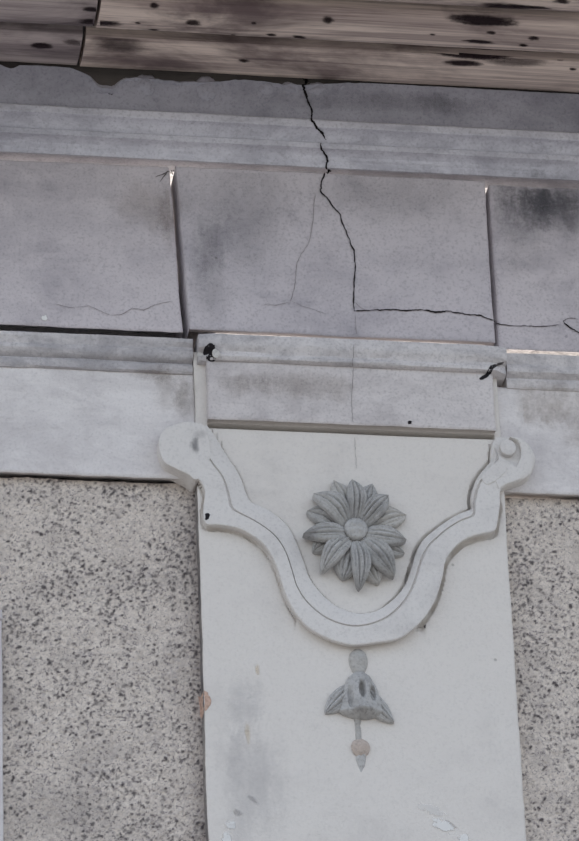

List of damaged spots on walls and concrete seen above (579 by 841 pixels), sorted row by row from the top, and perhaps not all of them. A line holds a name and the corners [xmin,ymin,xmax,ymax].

crack [264,78,579,422]